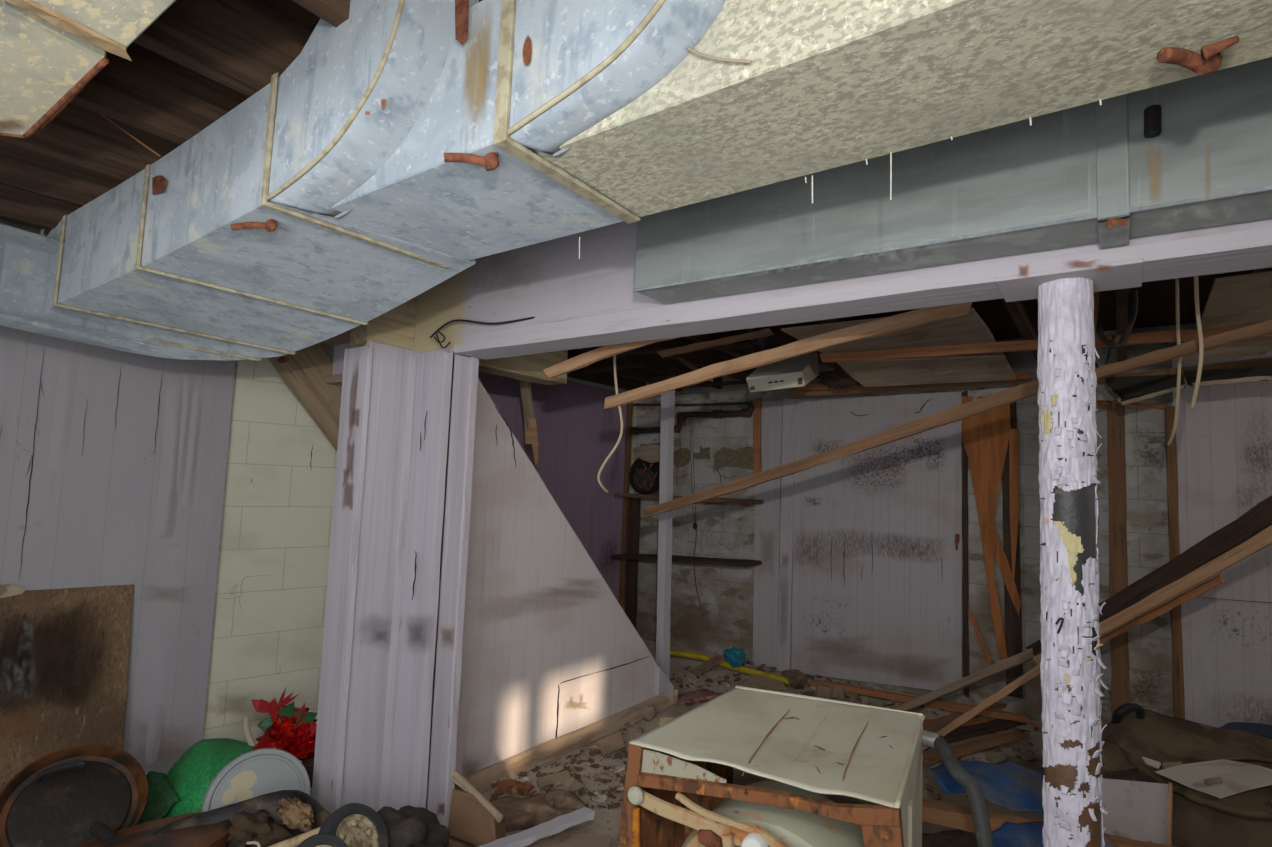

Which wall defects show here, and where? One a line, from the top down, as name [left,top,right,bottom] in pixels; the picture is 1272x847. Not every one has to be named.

peeling [1054,602,1109,775]
peeling [1088,797,1109,831]